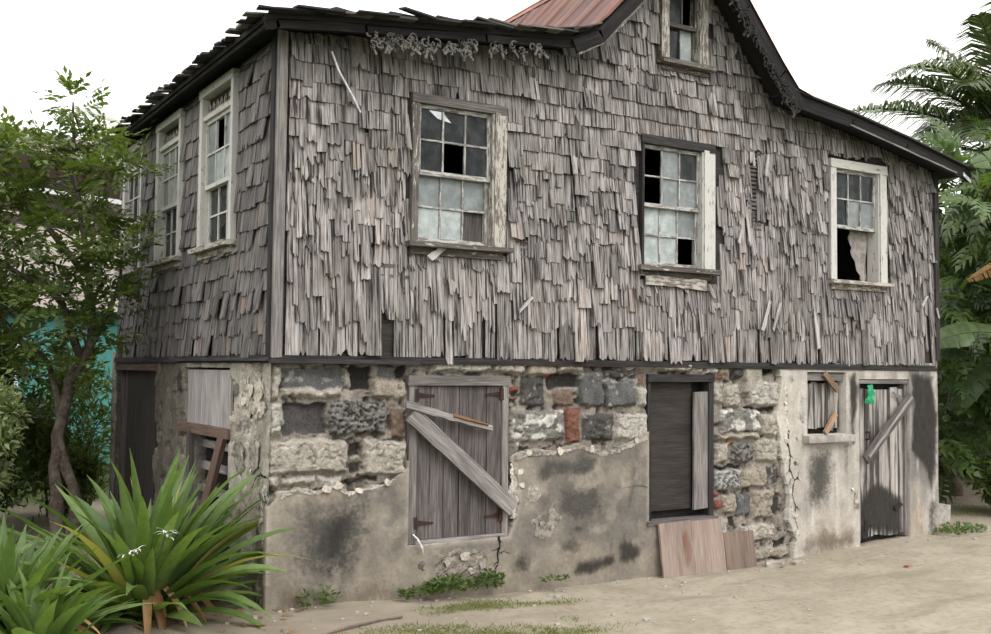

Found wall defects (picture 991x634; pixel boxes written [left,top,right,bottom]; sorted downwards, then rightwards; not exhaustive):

flaking render [237,376,266,419]
flaking render [232,440,260,475]
water stain [542,458,596,479]
spalling [783,384,802,540]
water stain [562,488,599,530]
water stain [306,500,368,572]
water stain [575,543,639,573]